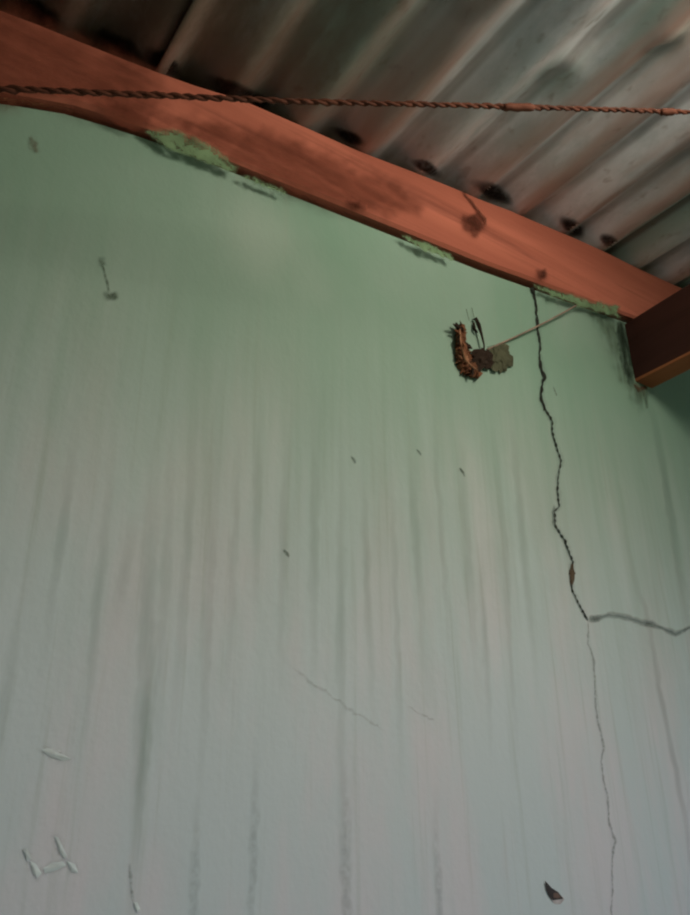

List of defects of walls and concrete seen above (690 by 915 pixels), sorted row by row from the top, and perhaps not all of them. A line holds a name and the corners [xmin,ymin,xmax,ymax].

crack [530,287,588,620]